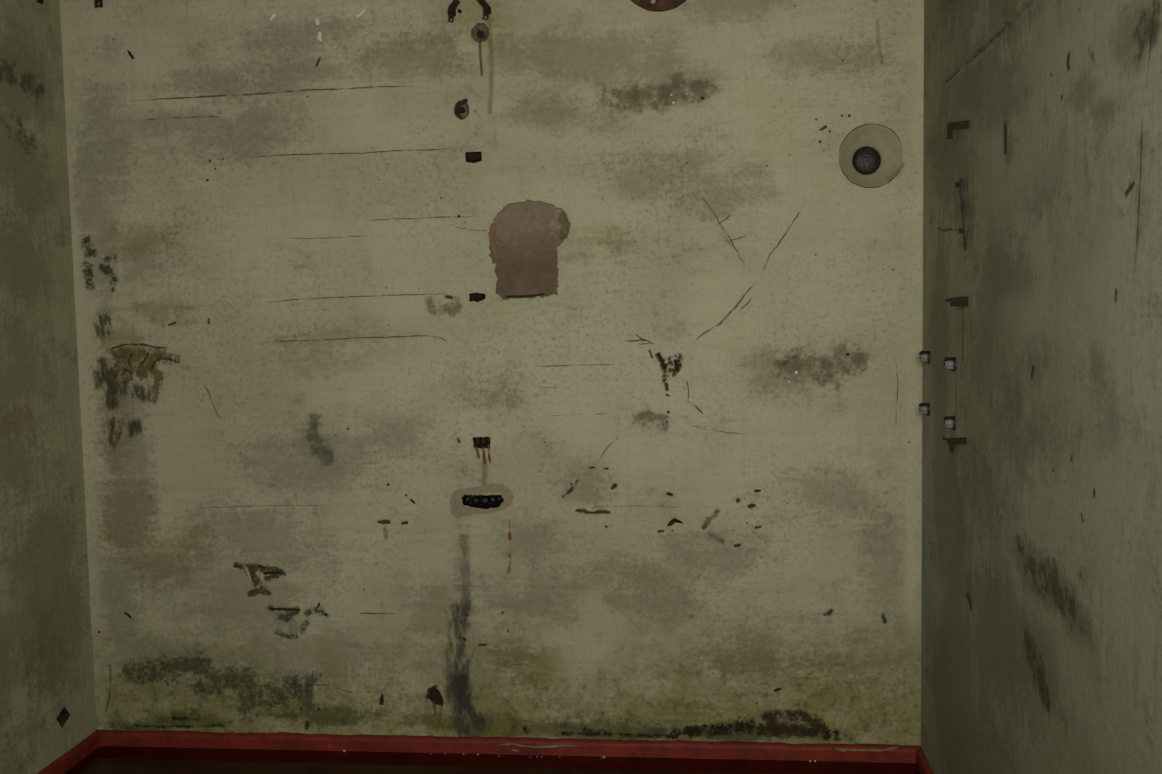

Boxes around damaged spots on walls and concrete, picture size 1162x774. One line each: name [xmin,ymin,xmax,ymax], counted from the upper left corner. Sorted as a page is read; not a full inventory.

spalling [488,199,571,300]
mould [123,657,320,730]
damp [446,604,487,737]
mould [561,710,839,741]